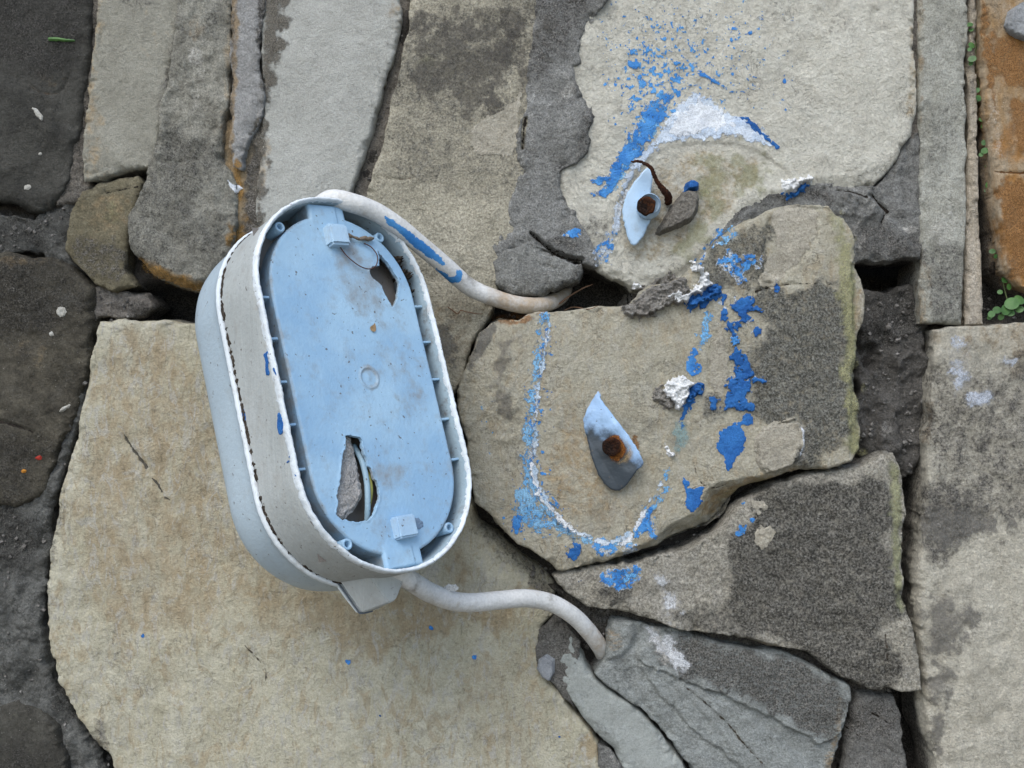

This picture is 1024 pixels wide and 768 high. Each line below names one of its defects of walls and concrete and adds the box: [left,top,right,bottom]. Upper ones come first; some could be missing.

rust [226,226,245,246]
rust [139,258,202,292]
rust [610,435,639,462]